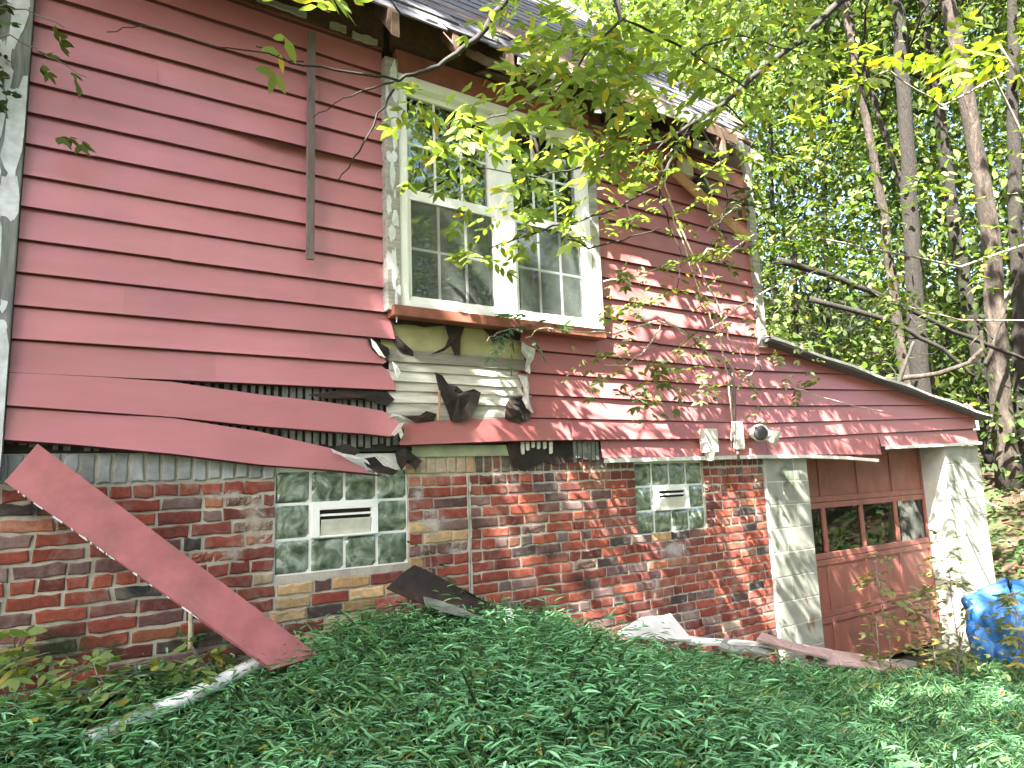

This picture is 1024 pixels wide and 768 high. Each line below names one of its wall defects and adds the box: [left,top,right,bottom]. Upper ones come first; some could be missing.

peeling [0,0,30,260]
peeling [0,300,9,463]